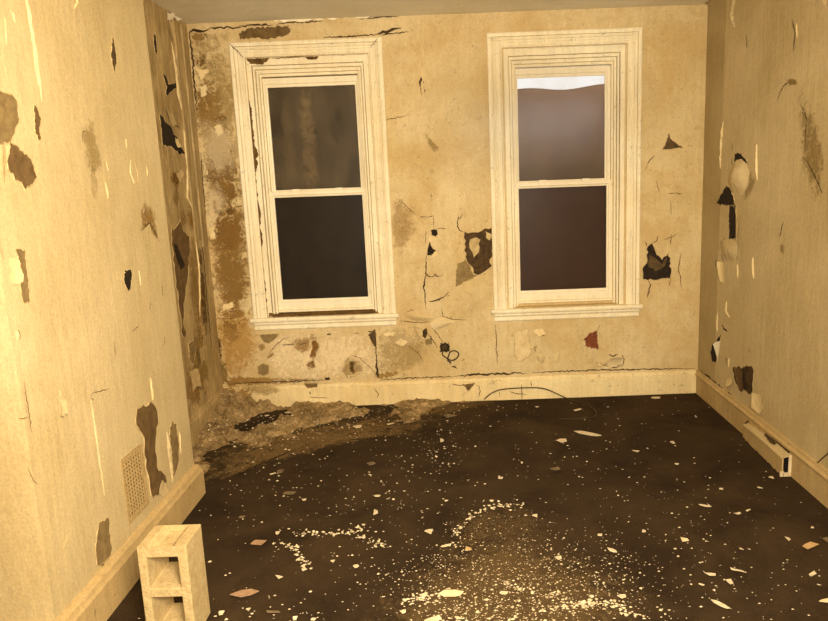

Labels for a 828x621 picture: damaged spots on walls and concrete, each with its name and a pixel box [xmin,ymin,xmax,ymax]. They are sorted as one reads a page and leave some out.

crack [189,16,407,108]
peeling [165,12,192,207]
peeling [0,91,37,192]
peeling [0,236,30,304]
crack [423,255,450,307]
flaking render [455,227,492,287]
hole [642,237,672,297]
peeling [582,325,600,350]
peeling [725,358,764,414]
peeling [135,378,181,499]
peeling [95,517,113,567]